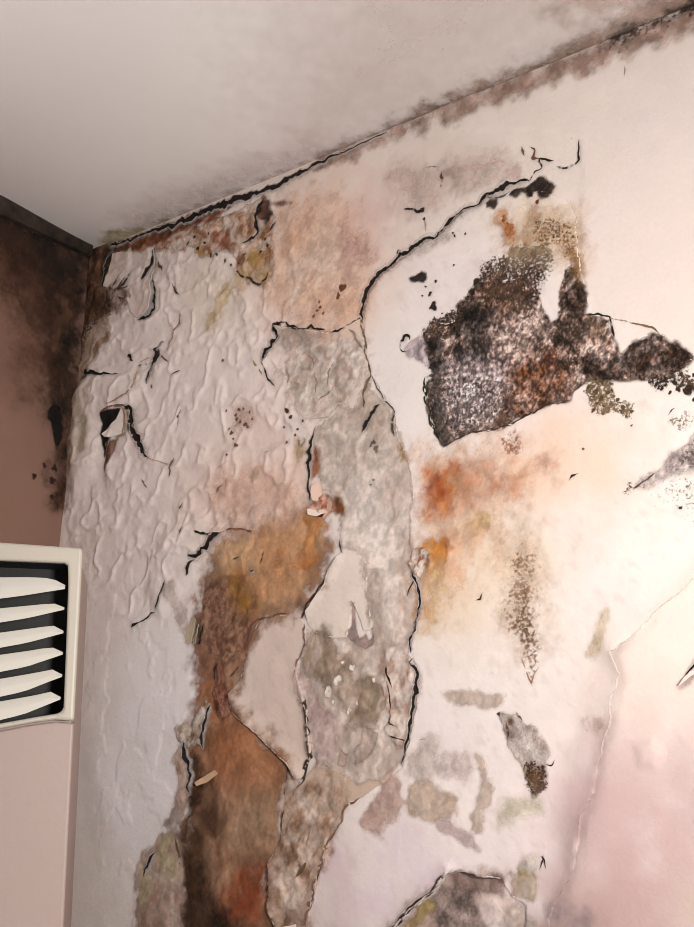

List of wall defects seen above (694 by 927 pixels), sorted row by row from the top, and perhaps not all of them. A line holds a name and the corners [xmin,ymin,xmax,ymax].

damp [318,0,694,164]
spalling [99,195,286,320]
crack [109,132,387,252]
damp [0,218,170,510]
damp [400,243,694,454]
damp [617,408,694,509]
spalling [162,580,204,645]
peeling [228,191,694,927]
spalling [172,700,218,814]
damp [134,793,196,927]